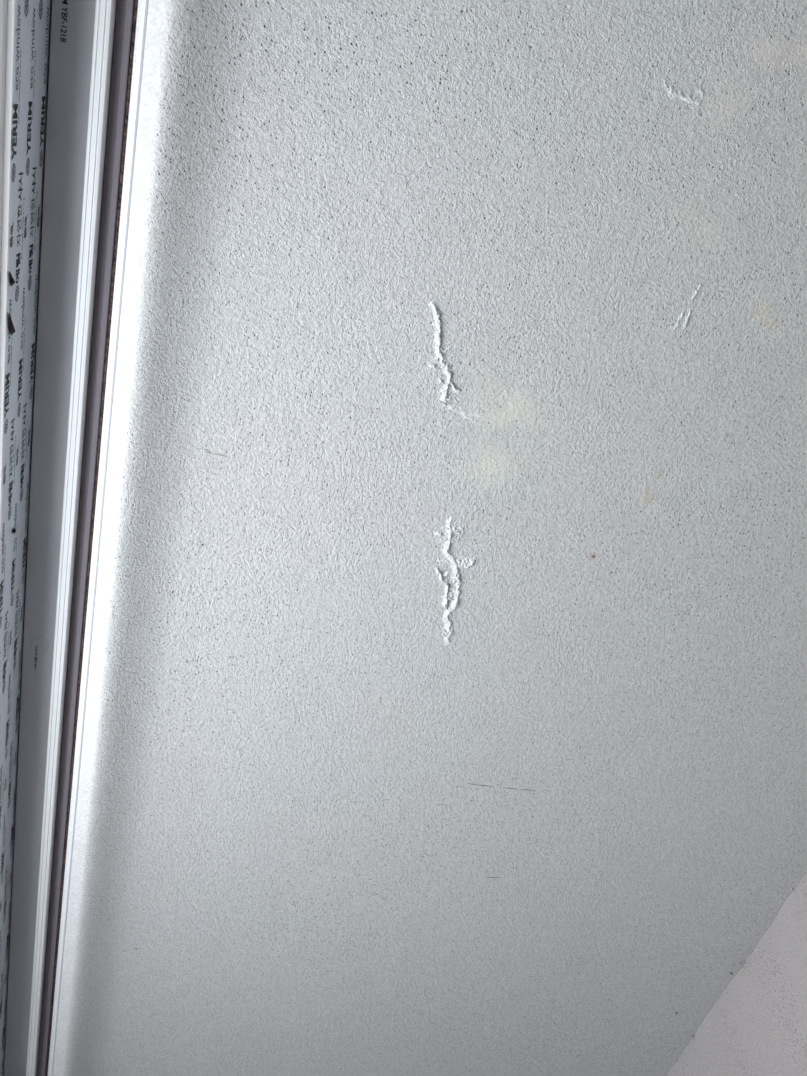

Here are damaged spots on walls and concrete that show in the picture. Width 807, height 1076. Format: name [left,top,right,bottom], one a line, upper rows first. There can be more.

crack [427,300,487,422]
crack [433,516,475,646]